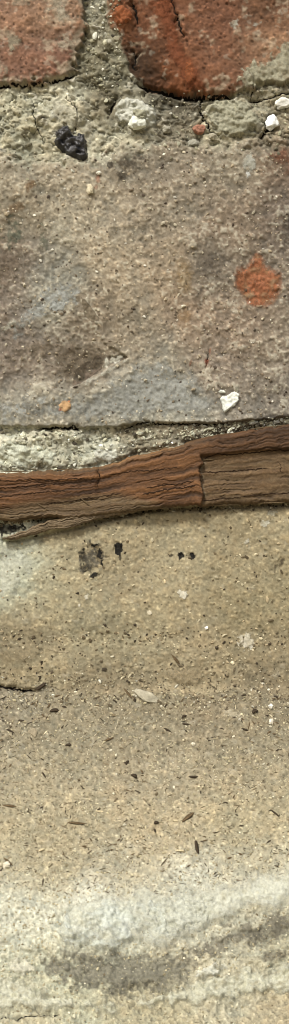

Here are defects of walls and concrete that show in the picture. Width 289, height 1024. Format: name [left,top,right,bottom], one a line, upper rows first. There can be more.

crack [42,423,79,431]
crack [125,421,221,429]